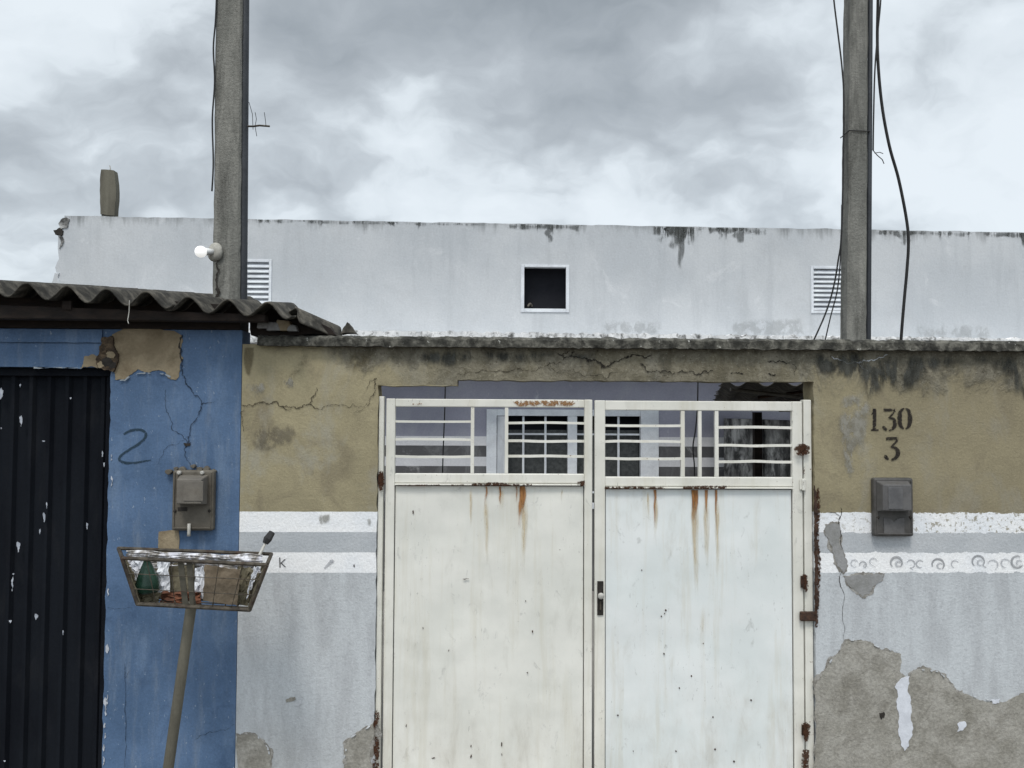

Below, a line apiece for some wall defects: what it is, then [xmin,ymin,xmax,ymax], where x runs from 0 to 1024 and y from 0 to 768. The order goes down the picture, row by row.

damp [654,226,694,262]
spalling [34,329,183,381]
crack [457,351,743,379]
damp [817,354,950,391]
crack [158,334,212,468]
crack [240,378,377,431]
corrosion [794,444,810,475]
corrosion [683,485,727,526]
corrosion [804,485,821,627]
spalling [823,521,885,599]
spalling [812,639,1024,768]
spalling [342,723,382,768]